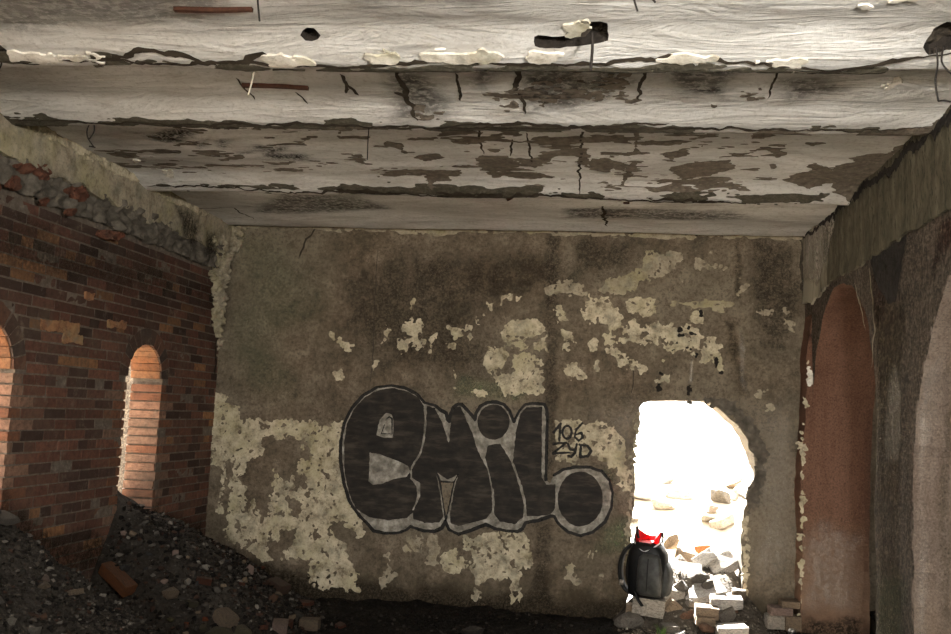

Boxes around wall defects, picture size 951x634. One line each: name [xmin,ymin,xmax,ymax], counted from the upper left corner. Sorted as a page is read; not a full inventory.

peeling [0,45,172,68]
spalling [215,35,903,112]
peeling [563,19,608,39]
spalling [925,22,951,45]
flaking render [0,104,951,397]
peeling [210,392,366,593]